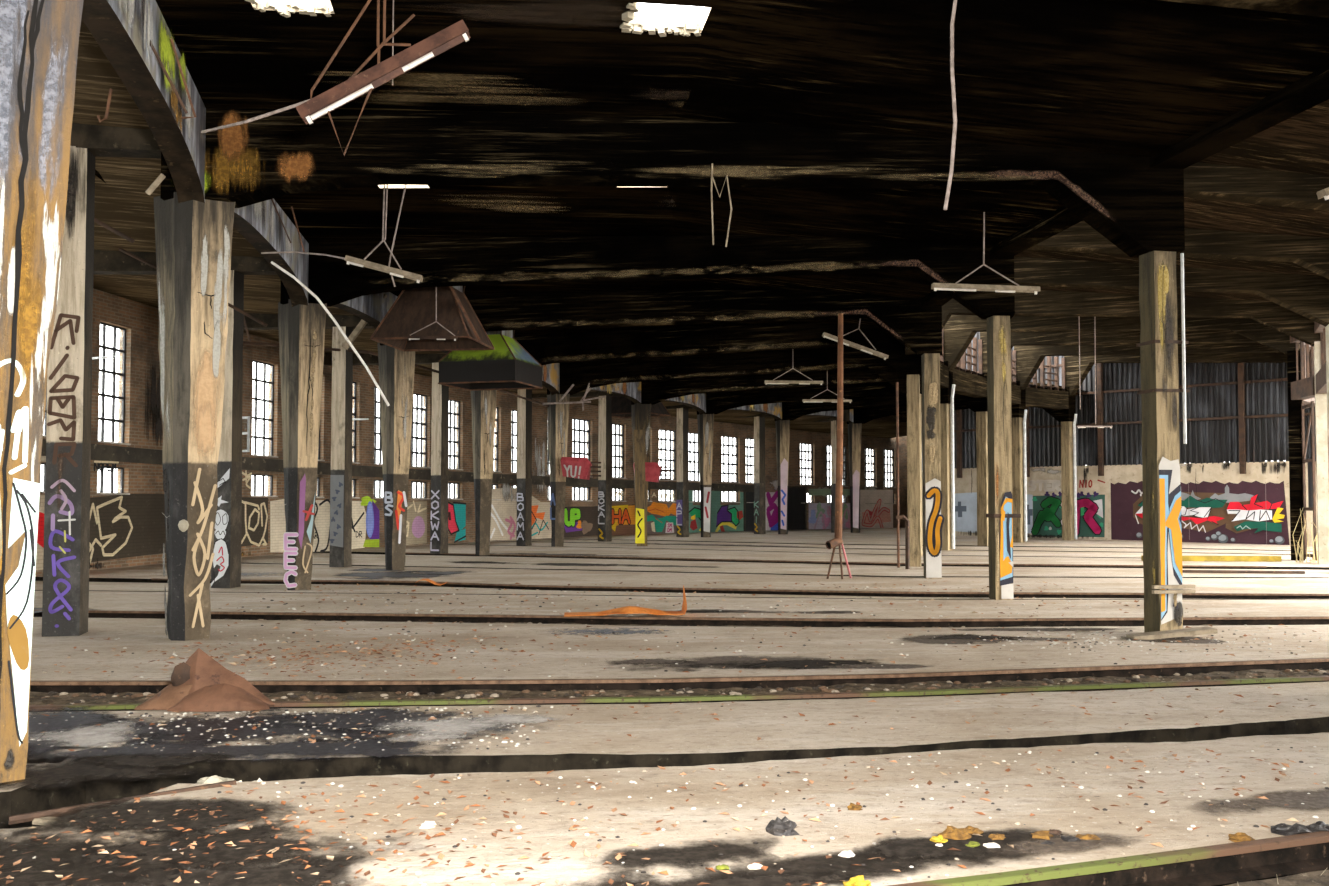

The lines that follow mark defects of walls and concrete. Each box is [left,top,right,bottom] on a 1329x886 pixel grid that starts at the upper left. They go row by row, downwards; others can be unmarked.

damp [0,0,27,177]
damp [39,48,85,237]
rust [205,112,258,192]
rust [280,153,312,181]
crack [0,0,44,681]
damp [17,209,40,380]